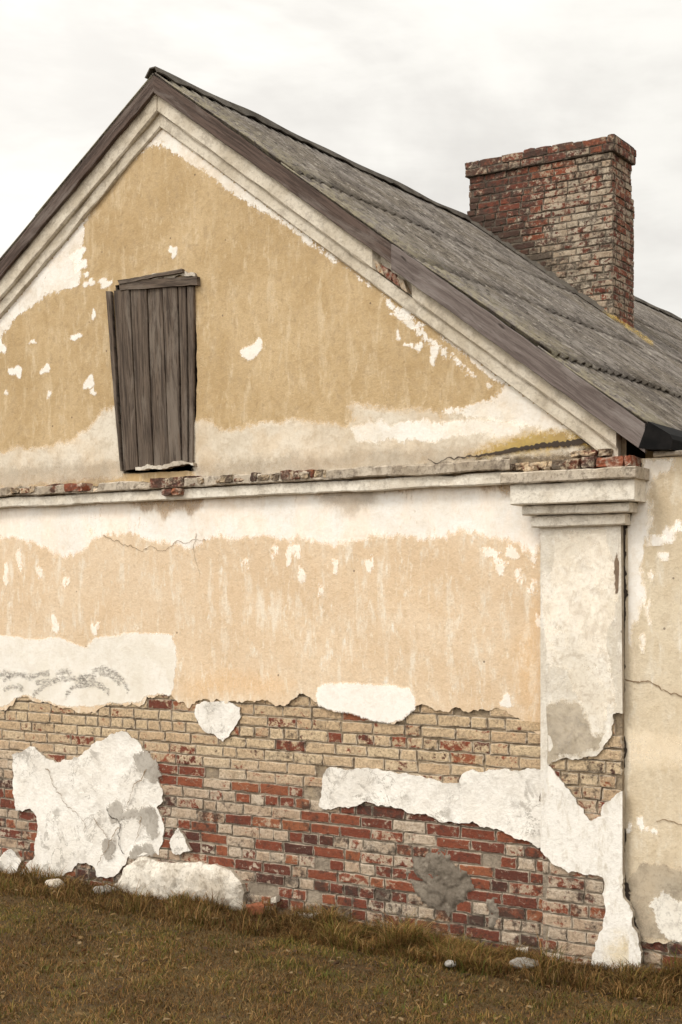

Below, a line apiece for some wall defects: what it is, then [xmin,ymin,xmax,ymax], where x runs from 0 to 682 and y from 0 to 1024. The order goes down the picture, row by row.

peeling [136,130,371,288]
peeling [0,214,112,354]
leakage [0,461,121,488]
leakage [200,447,473,476]
crack [104,535,205,573]
crack [623,502,638,629]
spalling [0,293,682,972]
crack [624,661,682,697]
crack [624,875,638,929]